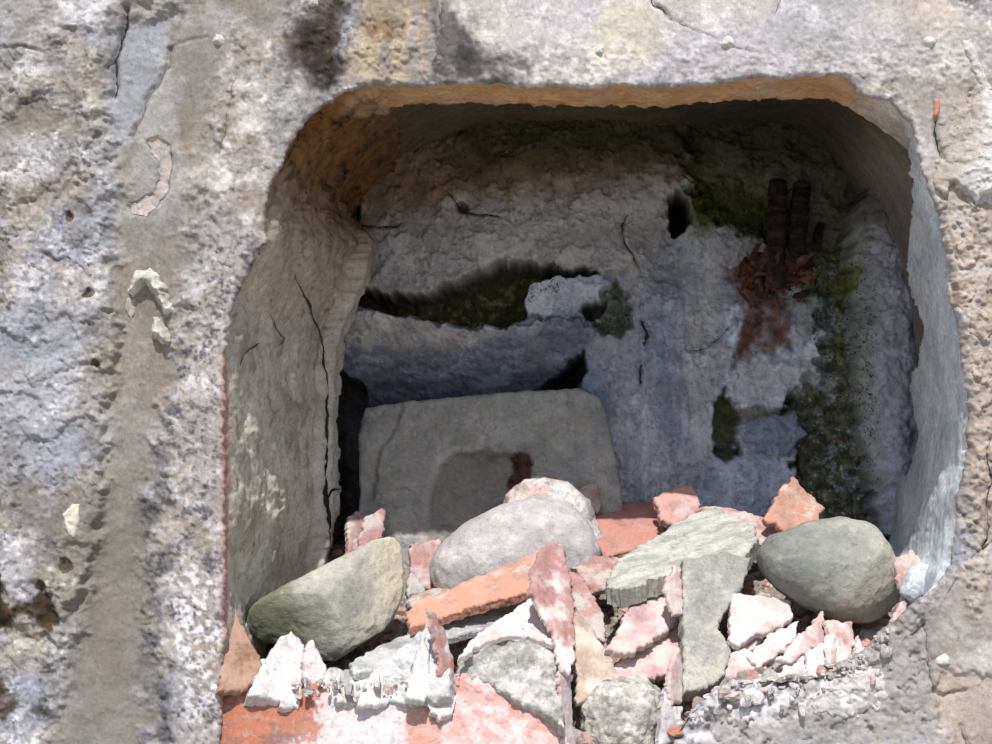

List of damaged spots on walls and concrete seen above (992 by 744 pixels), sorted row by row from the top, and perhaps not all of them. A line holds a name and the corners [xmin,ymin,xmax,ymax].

crack [108,15,129,98]
crack [131,36,208,139]
crack [651,0,765,54]
corrosion [726,242,818,363]
crack [295,276,339,550]
peeling [344,508,386,554]
spalling [578,482,602,514]
peeling [889,550,921,623]
peeling [724,611,864,679]